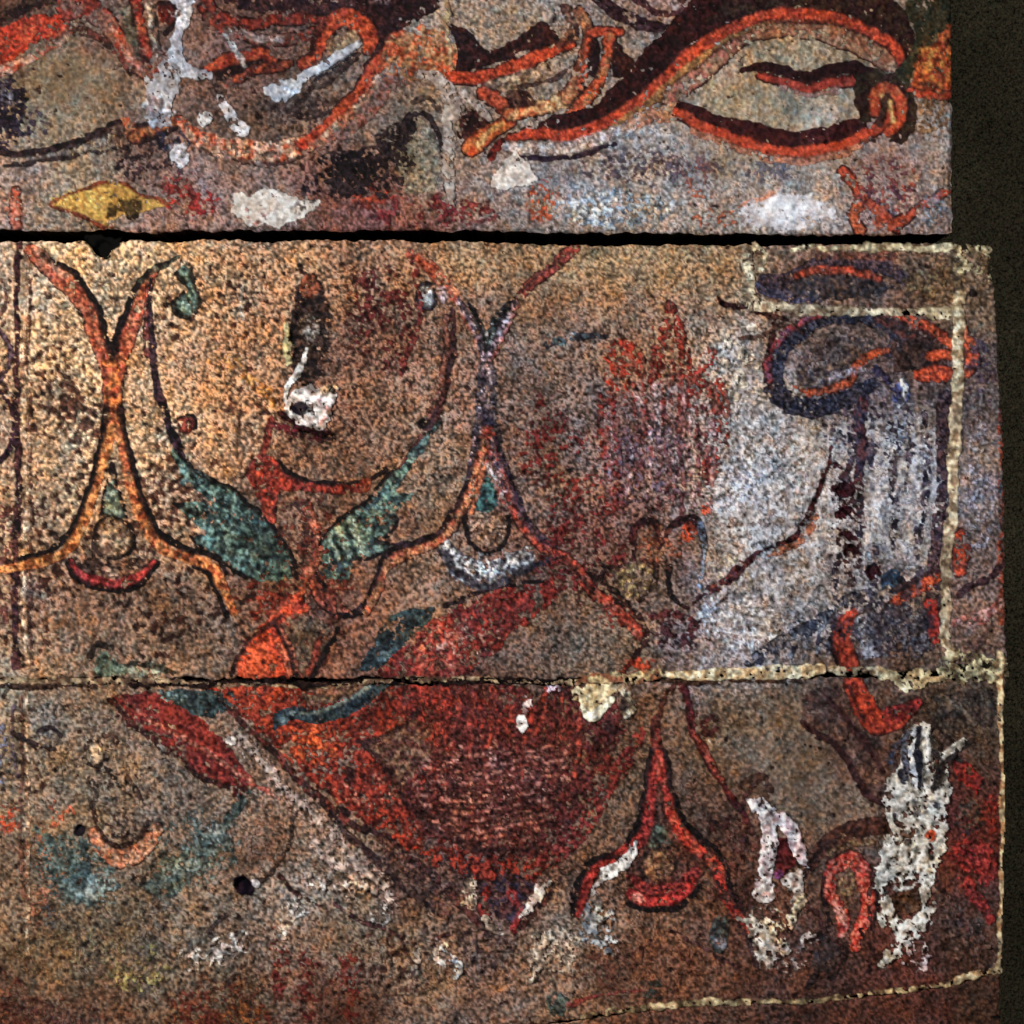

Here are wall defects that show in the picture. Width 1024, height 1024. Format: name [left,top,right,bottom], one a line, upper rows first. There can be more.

crack [0,683,97,698]
crack [127,675,581,691]
crack [660,678,802,686]
peeling [225,733,400,925]
peeling [273,896,313,941]
peeling [178,931,248,971]